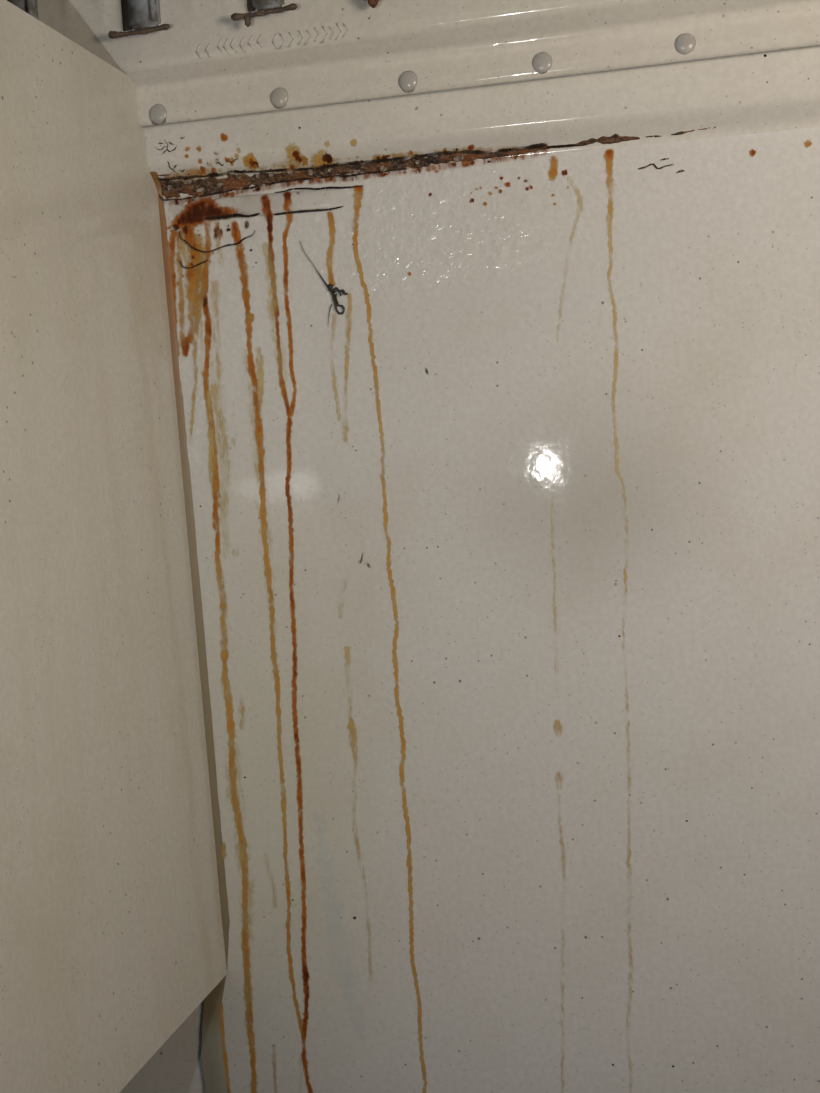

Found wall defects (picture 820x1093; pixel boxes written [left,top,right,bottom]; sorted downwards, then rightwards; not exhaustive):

crack [155,137,585,269]
rust [348,139,417,161]
rust [470,177,533,206]
rust [549,156,569,189]
rust [604,149,618,402]
rust [333,294,352,398]
rust [165,141,346,1093]
rust [352,185,427,1093]